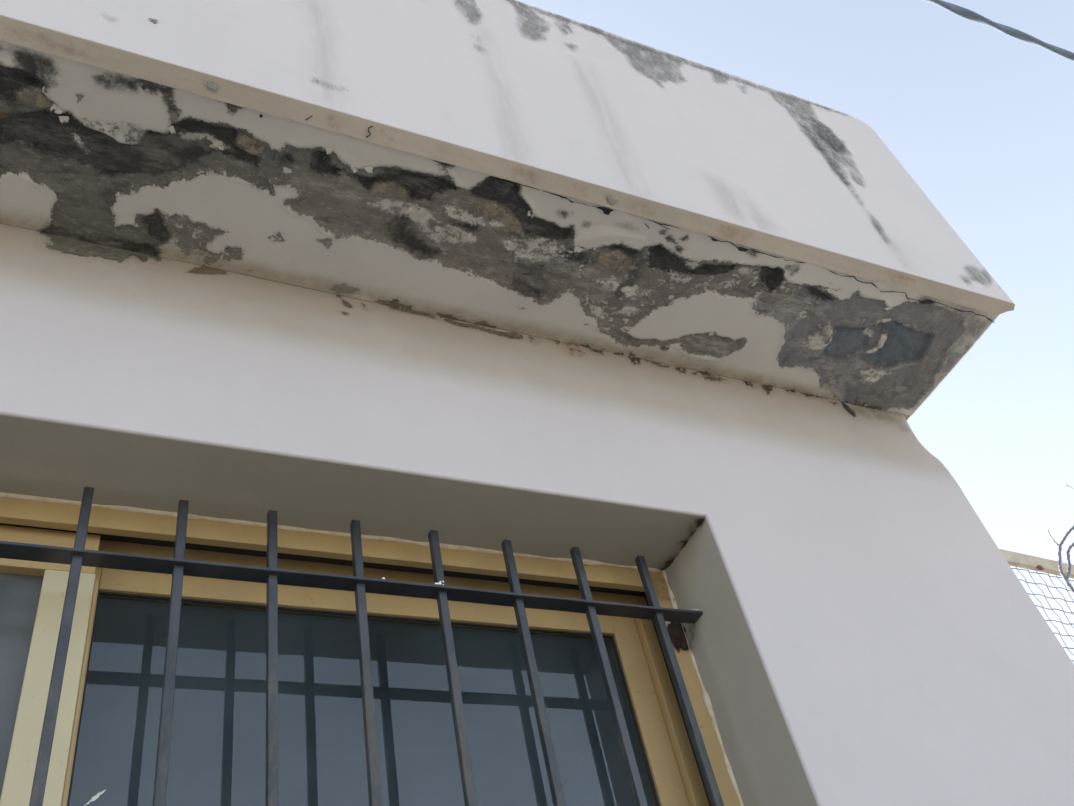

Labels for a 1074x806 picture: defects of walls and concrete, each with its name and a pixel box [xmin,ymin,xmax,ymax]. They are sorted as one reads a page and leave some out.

damp [457,0,481,22]
damp [509,0,863,192]
crack [490,176,614,215]
flaking render [0,64,985,417]
crack [709,236,995,323]